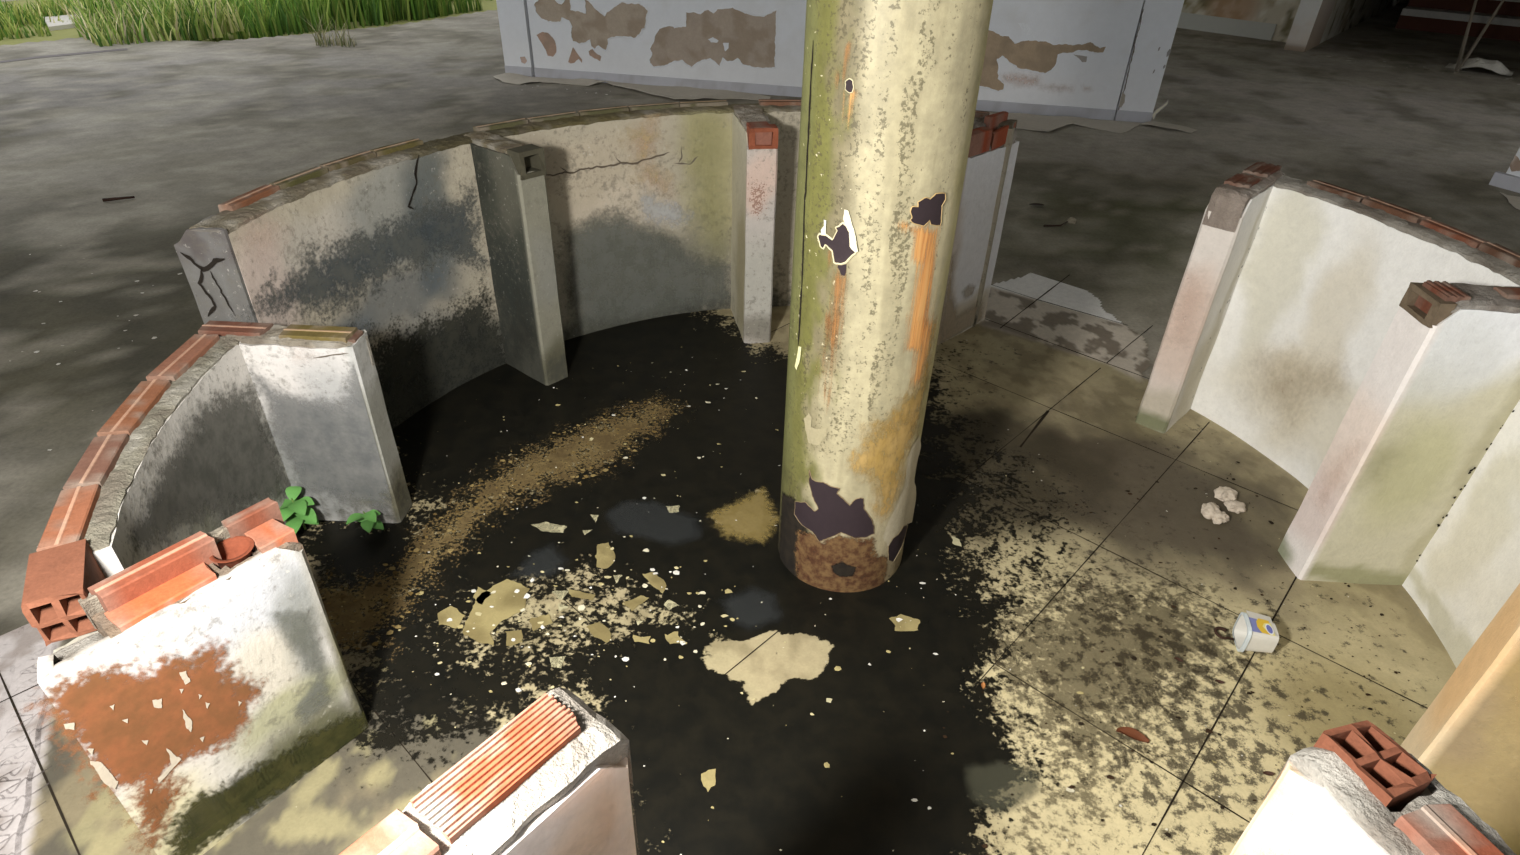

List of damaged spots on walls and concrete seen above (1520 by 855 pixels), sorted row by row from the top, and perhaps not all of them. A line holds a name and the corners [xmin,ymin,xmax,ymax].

peeling [533,0,778,70]
peeling [979,23,1107,92]
crack [408,155,419,209]
crack [547,146,698,176]
peeling [817,210,858,276]
crack [180,252,235,317]
corrosion [851,225,937,516]
peeling [804,413,827,445]
leakage [130,189,1116,855]
corrosion [712,489,888,592]
peeling [794,435,921,562]